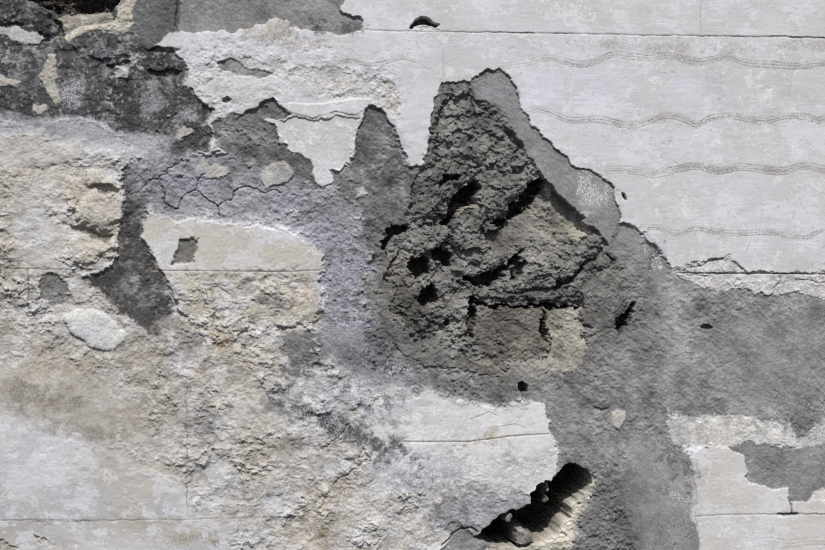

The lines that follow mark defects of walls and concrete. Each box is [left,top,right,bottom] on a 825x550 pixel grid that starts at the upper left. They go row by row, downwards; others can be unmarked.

spalling [0,0,474,550]
crack [129,145,375,371]
spalling [232,56,825,550]